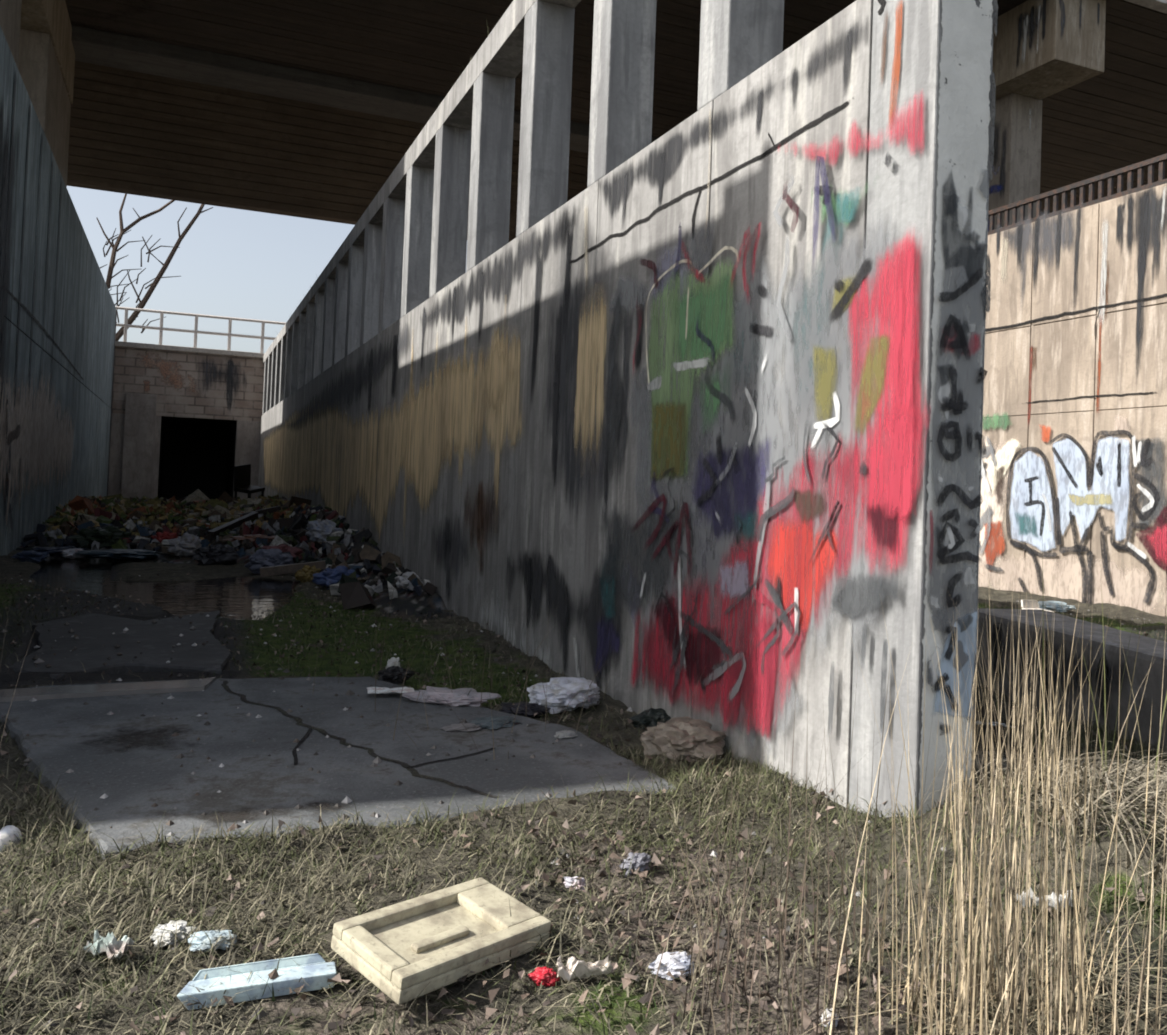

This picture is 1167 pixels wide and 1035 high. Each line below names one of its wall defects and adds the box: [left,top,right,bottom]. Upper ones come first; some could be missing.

damp [741,84,771,131]
damp [791,24,867,101]
damp [603,111,727,220]
crack [571,101,849,263]
damp [1099,187,1167,367]
damp [203,360,247,408]
crack [222,681,500,798]